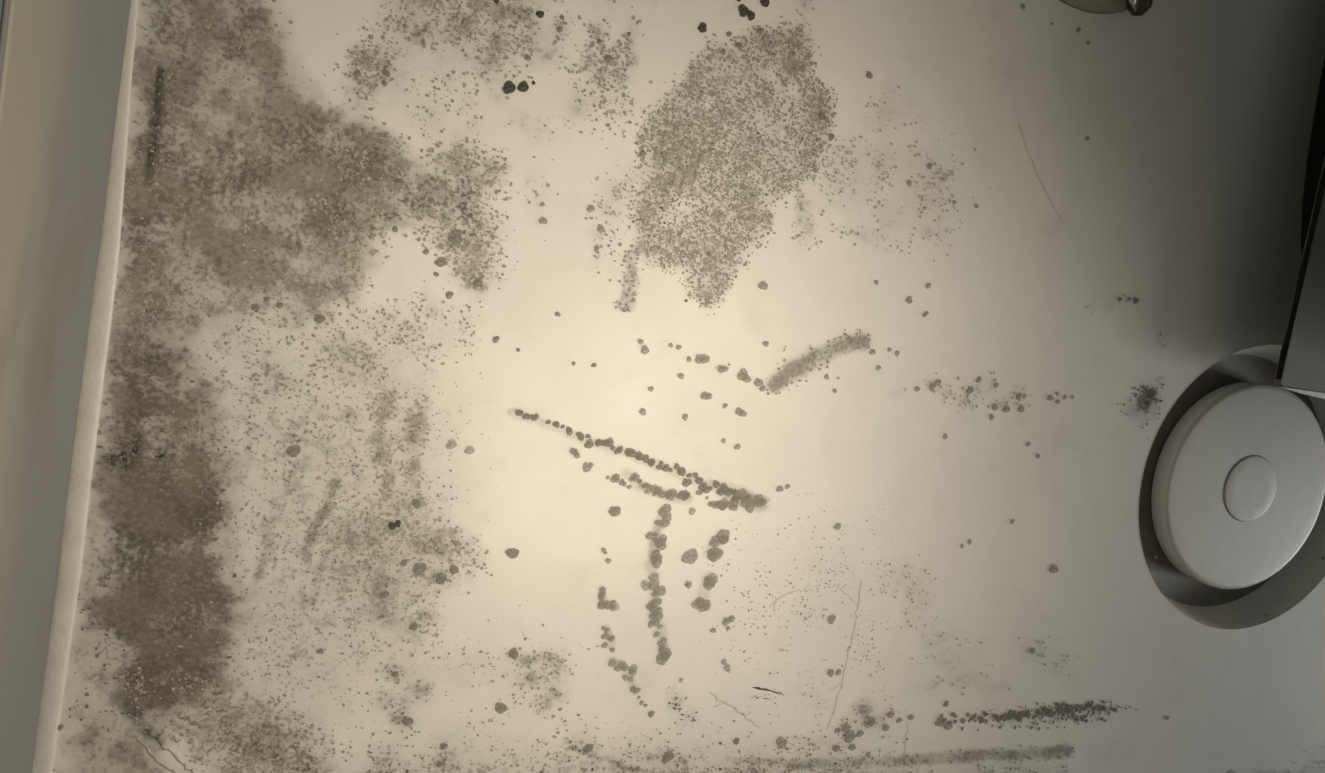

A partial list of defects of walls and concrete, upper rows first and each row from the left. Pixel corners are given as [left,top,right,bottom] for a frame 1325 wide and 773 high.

leakage [57,0,964,773]
mould [897,371,1031,421]
leakage [1117,377,1164,440]
mould [862,548,998,695]
mould [935,700,1137,773]